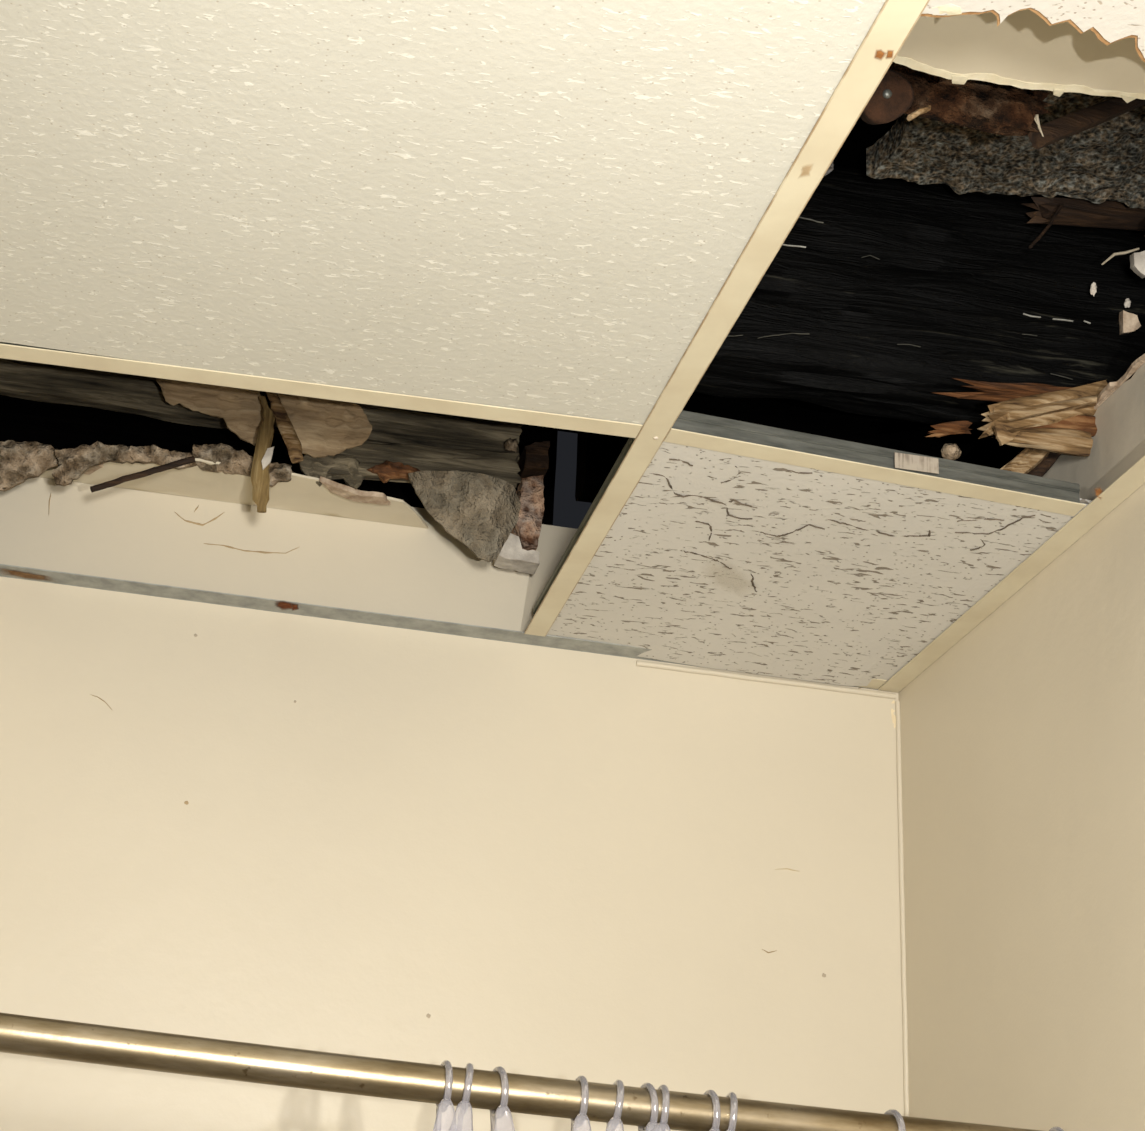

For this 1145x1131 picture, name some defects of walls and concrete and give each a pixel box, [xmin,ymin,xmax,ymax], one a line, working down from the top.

peeling [932,4,962,15]
flaking render [893,56,1145,103]
flaking render [1130,251,1145,279]
flaking render [1119,298,1141,335]
flaking render [1094,354,1145,410]
peeling [993,425,1020,446]
flaking render [72,458,429,529]
crack [649,459,1035,592]
corrosion [3,569,47,580]
corrosion [276,601,298,610]